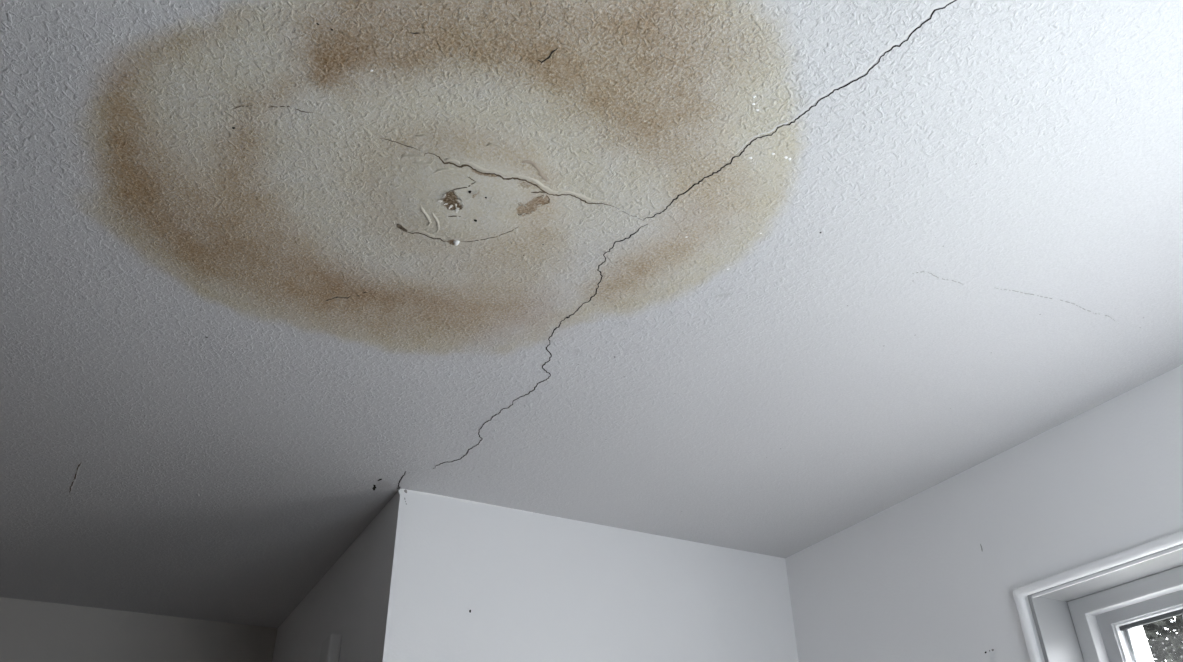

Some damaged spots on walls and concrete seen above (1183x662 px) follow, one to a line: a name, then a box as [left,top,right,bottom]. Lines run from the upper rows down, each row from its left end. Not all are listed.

leakage [35,0,830,376]
crack [380,0,957,487]
crack [996,288,1119,324]